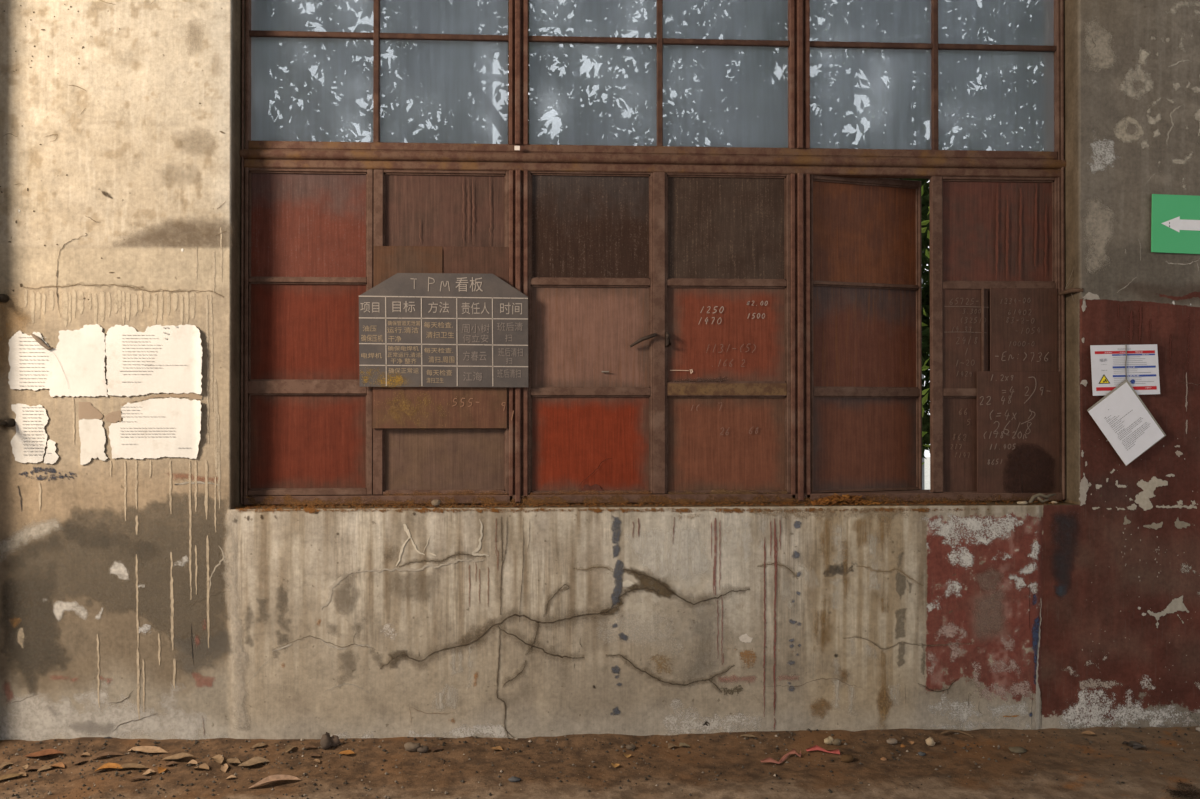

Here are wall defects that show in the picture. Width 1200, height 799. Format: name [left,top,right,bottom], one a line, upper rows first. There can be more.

peeling [1081,292,1100,312]
water stain [0,227,228,741]
peeling [1079,450,1198,530]
rust [236,492,1063,607]
peeling [922,513,1040,594]
crack [279,518,796,738]
peeling [927,581,962,612]
peeling [935,623,1032,700]
peeling [1064,657,1155,709]
water stain [1060,690,1200,728]
peeling [1147,595,1189,628]